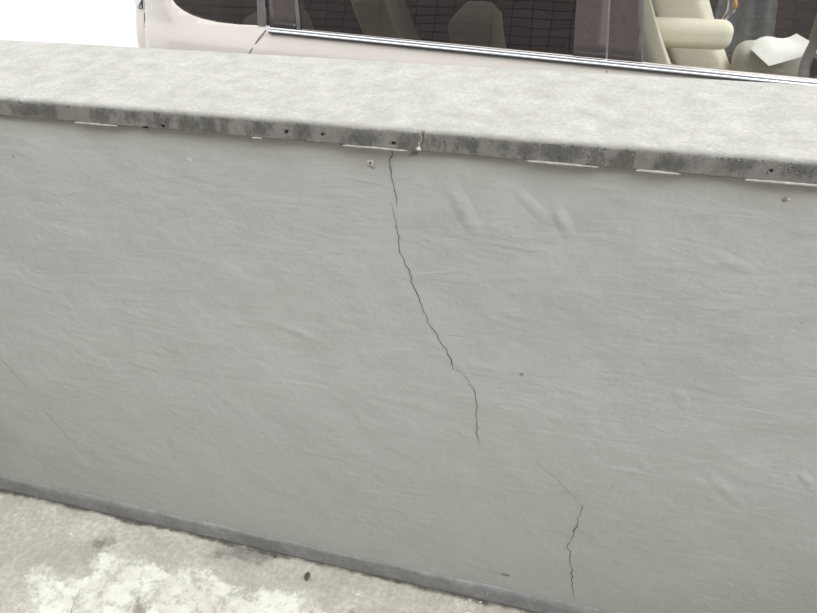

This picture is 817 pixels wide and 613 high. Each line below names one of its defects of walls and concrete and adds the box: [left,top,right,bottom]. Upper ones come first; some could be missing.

crack [416,130,426,151]
crack [389,153,479,442]
crack [537,457,583,601]